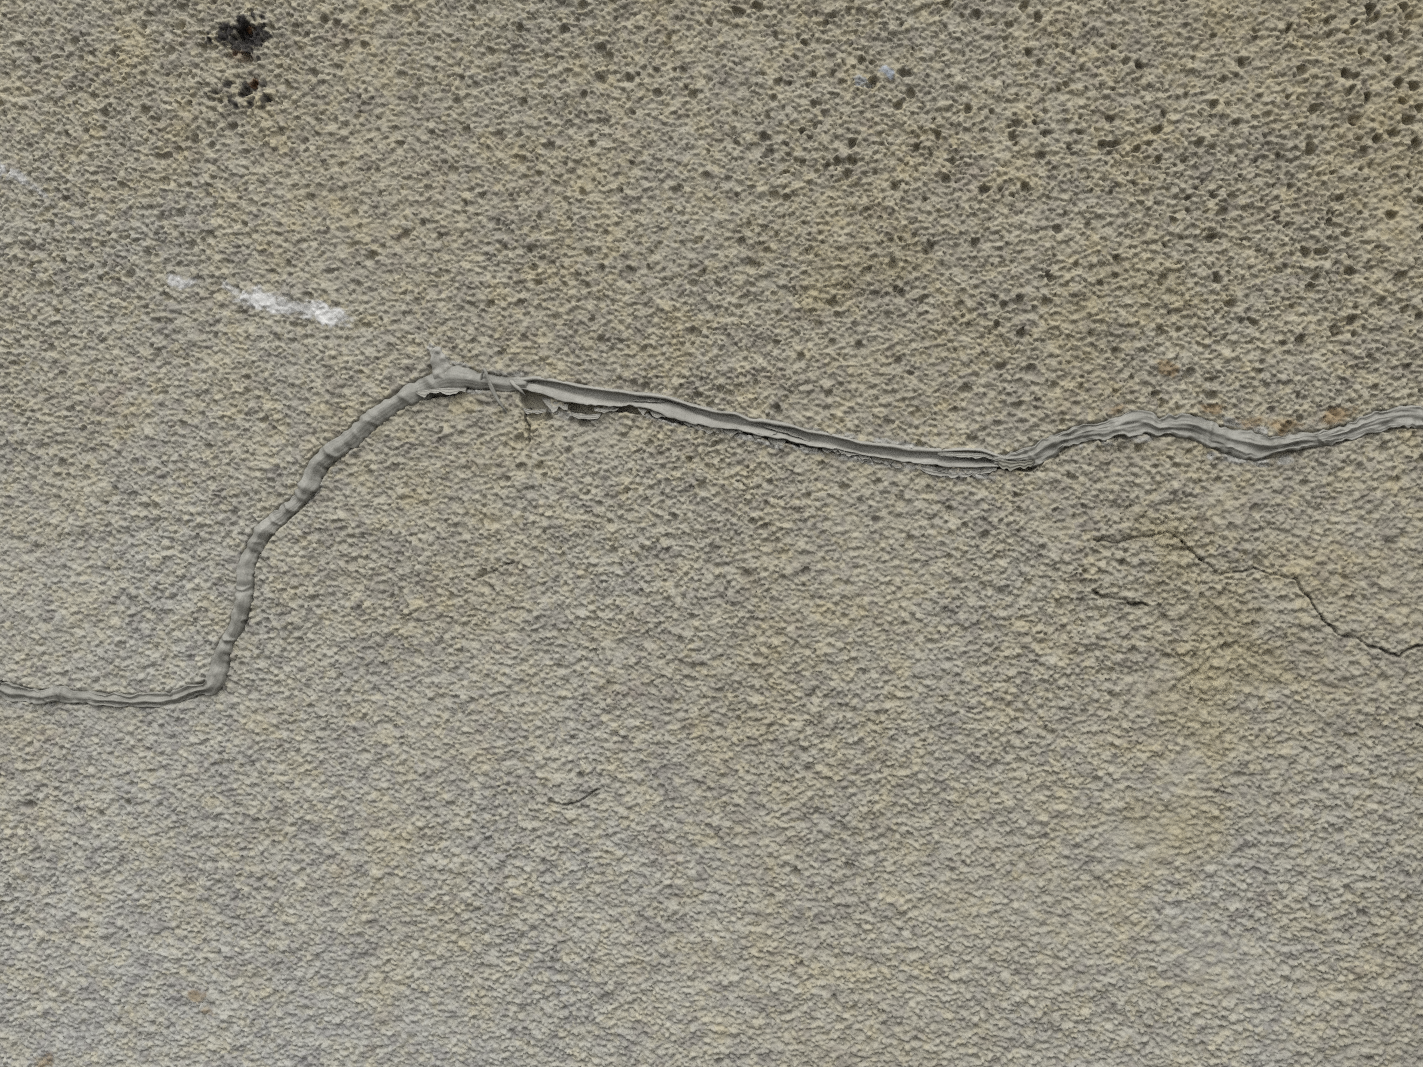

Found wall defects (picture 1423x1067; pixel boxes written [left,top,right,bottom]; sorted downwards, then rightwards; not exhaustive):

crack [0,343,1423,712]